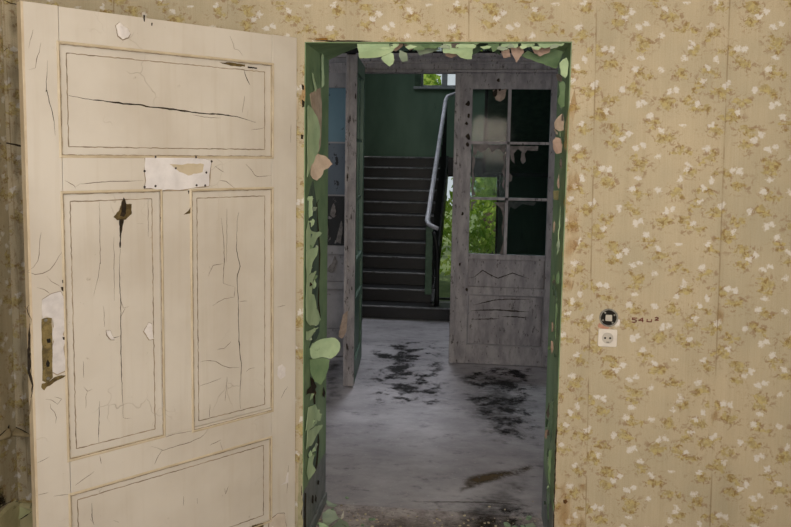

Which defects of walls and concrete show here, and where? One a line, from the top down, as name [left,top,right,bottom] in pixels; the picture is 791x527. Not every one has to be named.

peeling [357,43,569,254]
peeling [282,54,348,527]
leakage [374,342,440,405]
leakage [466,369,530,437]